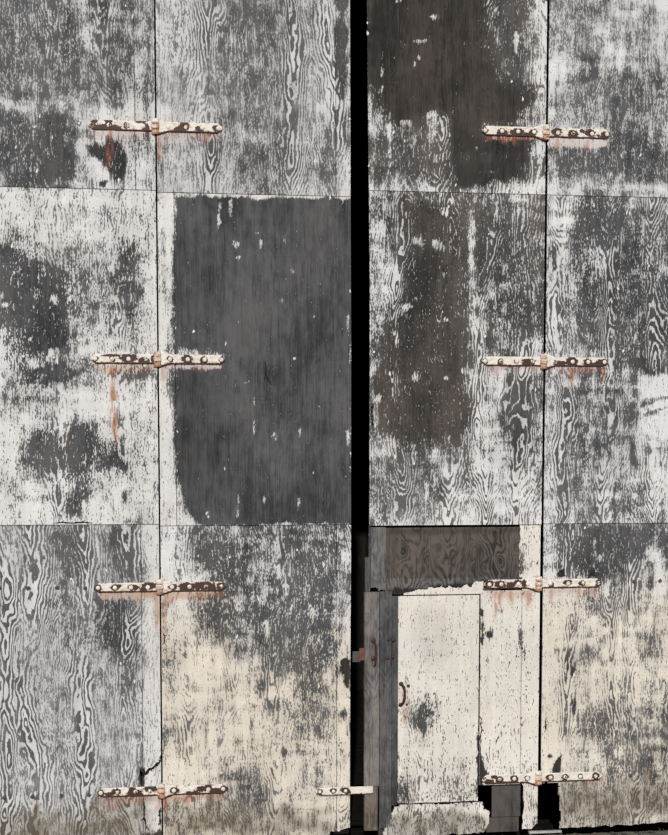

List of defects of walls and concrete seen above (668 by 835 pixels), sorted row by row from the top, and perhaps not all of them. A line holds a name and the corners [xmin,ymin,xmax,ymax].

rust [87,121,224,171]
rust [482,127,612,156]
peeling [367,0,668,526]
rust [92,355,226,448]
peeling [0,0,351,760]
rust [482,358,609,393]
peeling [494,370,668,714]
rust [95,583,227,649]
rust [483,580,603,624]
peeling [569,695,664,776]
spalling [137,765,147,787]
crack [139,755,161,832]